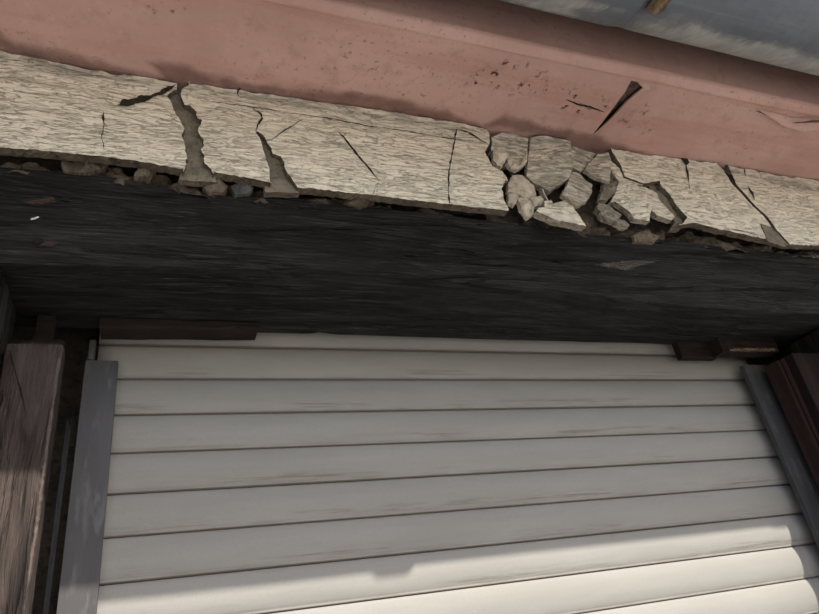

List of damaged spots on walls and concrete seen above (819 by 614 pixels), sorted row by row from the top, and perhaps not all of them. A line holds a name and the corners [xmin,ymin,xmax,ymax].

crack [101,84,176,148]
flaking render [169,90,217,187]
crack [212,88,486,204]
flaking render [479,132,683,245]
crack [682,158,690,189]
crack [728,224,788,249]